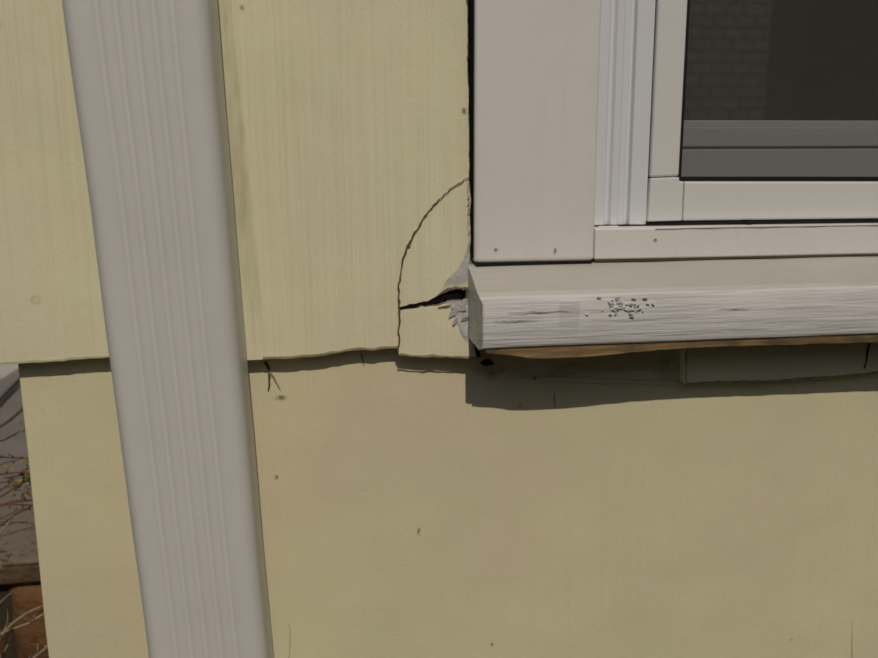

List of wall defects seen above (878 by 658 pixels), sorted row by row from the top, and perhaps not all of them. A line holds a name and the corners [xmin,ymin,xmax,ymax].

crack [397,177,470,351]
crack [863,343,871,369]